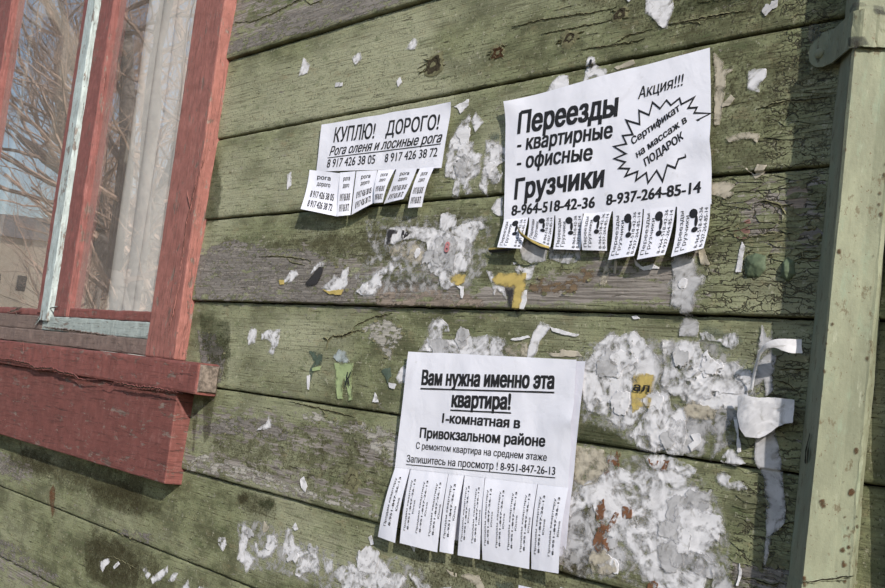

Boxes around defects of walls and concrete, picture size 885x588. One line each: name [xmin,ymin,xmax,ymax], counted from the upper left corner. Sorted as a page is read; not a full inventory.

crack [238,0,323,23]
peeling [227,0,399,55]
crack [713,174,828,262]
crack [324,313,391,350]